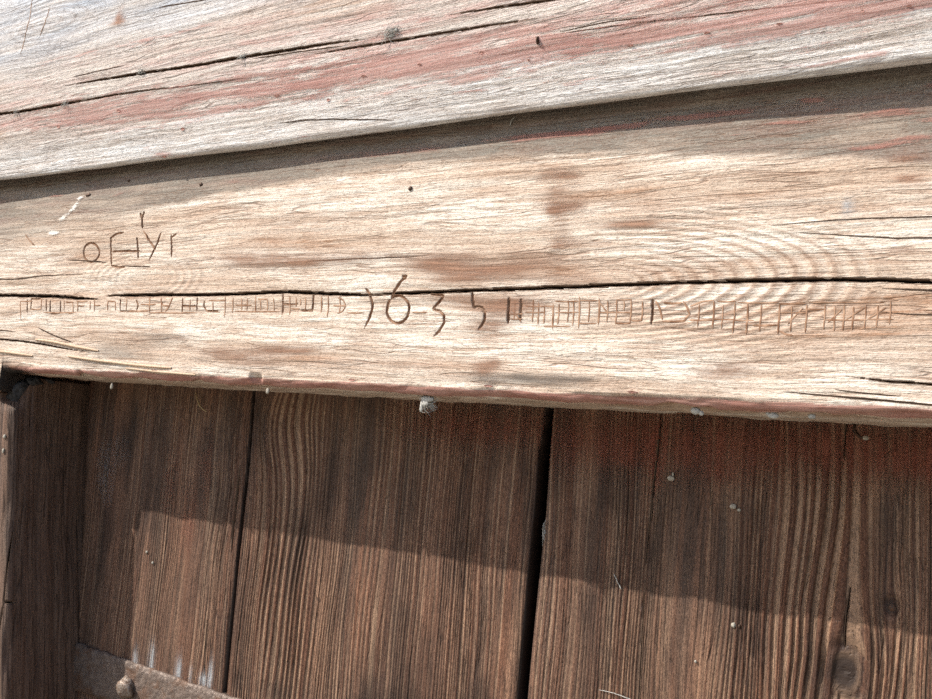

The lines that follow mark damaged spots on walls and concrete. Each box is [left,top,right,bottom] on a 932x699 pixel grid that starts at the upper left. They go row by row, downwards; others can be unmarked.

crack [0,0,846,115]
crack [319,254,417,262]
crack [0,260,932,300]